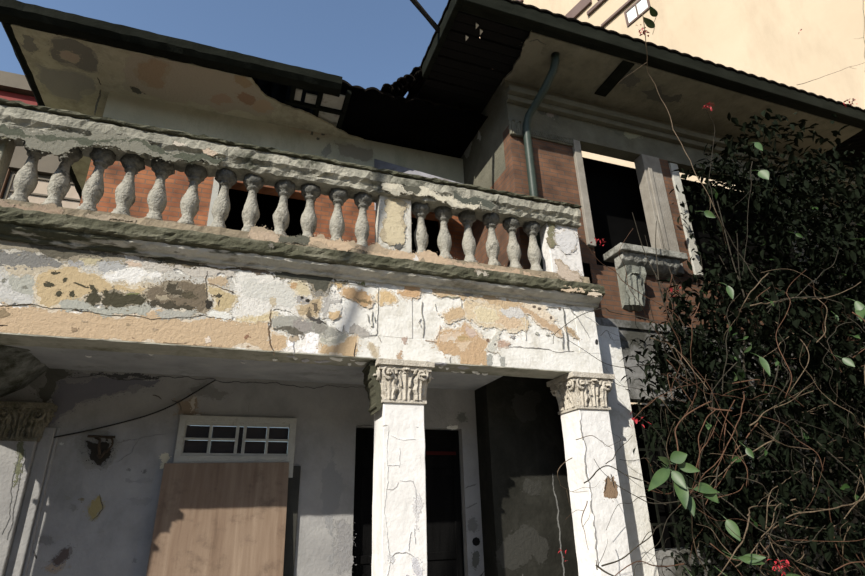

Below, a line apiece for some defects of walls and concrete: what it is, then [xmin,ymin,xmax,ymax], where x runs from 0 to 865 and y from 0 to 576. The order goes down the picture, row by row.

peeling [123,52,277,115]
peeling [0,248,379,366]
peeling [332,282,579,375]
crack [547,306,599,351]
crack [55,374,365,409]
crack [357,425,417,508]
spalling [603,476,618,501]
crack [392,530,416,576]